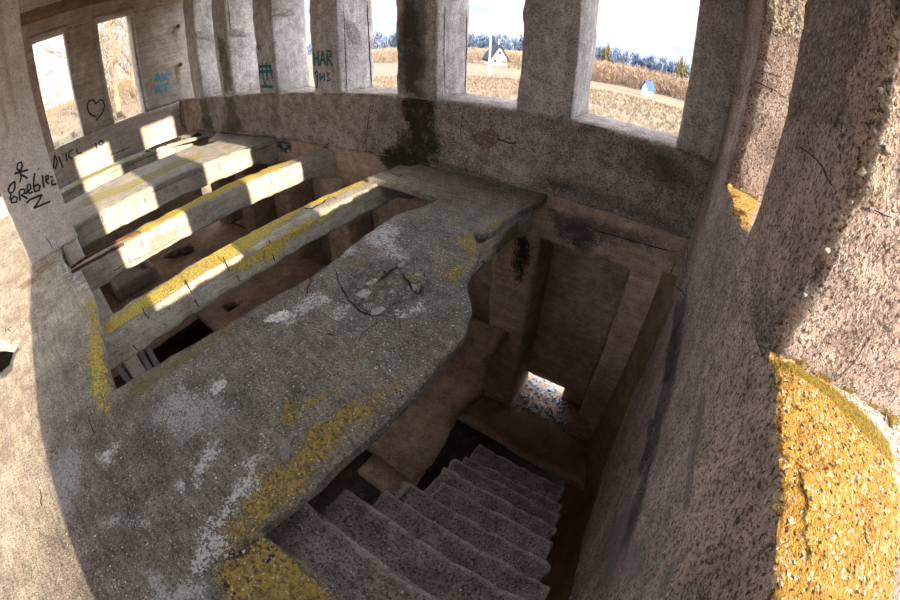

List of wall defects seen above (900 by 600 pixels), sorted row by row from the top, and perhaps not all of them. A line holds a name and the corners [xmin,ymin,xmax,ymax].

water stain [376,99,438,170]
crack [797,146,837,191]